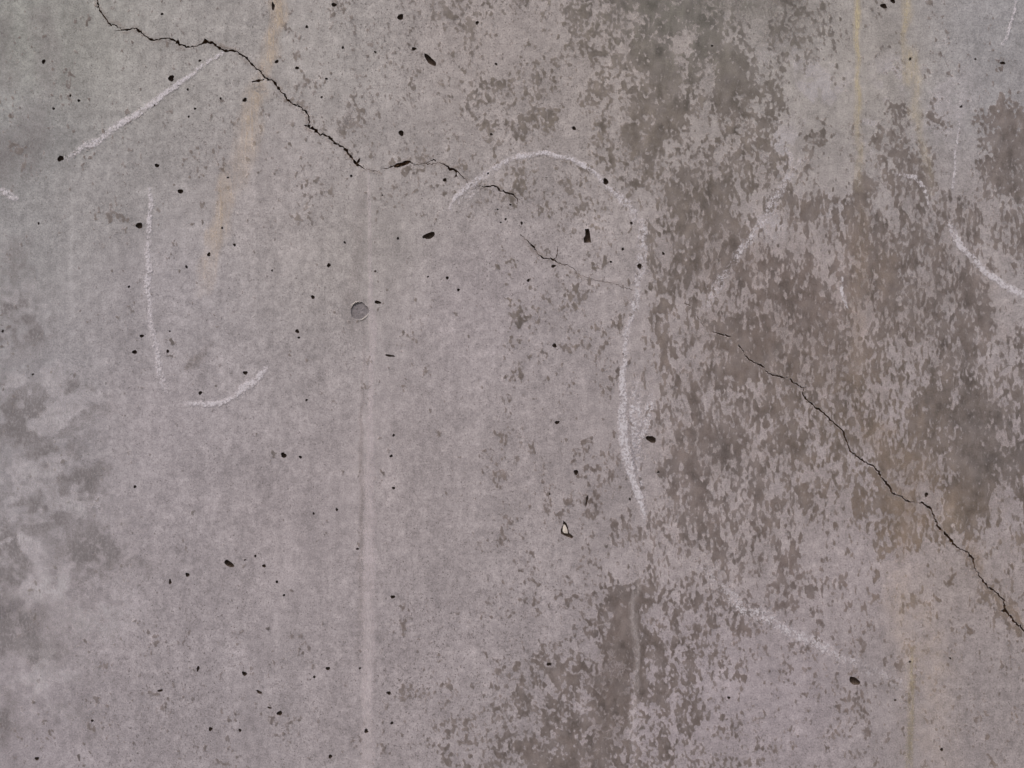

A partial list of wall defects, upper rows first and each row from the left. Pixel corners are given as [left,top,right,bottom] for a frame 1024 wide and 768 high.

crack [97,0,518,202]
crack [521,235,635,291]
crack [684,303,1024,632]